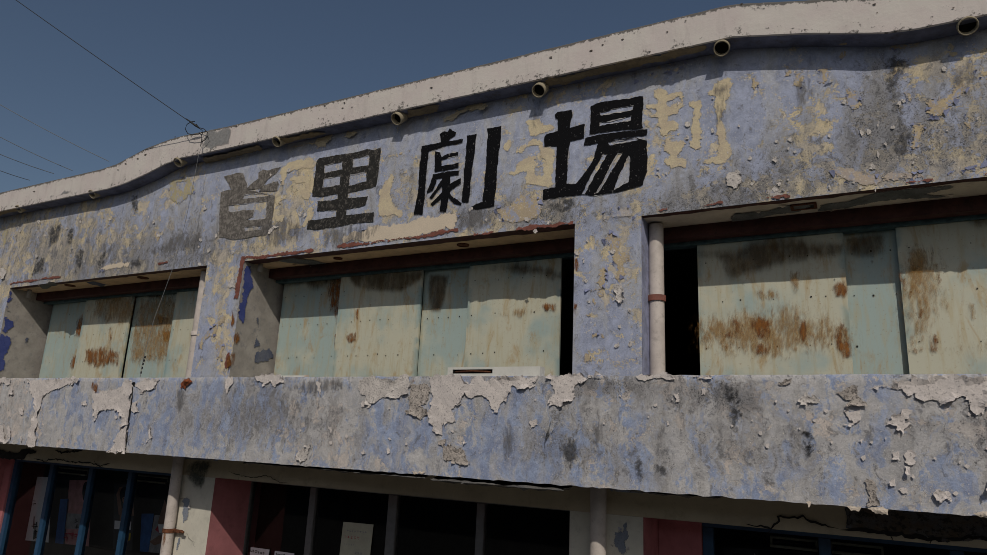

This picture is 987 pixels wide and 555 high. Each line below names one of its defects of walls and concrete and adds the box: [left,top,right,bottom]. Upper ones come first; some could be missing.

peeling [546,45,707,86]
peeling [279,132,486,243]
corrosion [299,272,447,316]
corrosion [835,282,847,296]
corrosion [70,335,118,368]
corrosion [76,295,175,360]
corrosion [699,307,850,357]
crack [37,384,133,470]
peeling [358,371,602,465]
peeling [836,373,987,427]
crack [747,515,987,543]
flaking render [845,479,987,543]